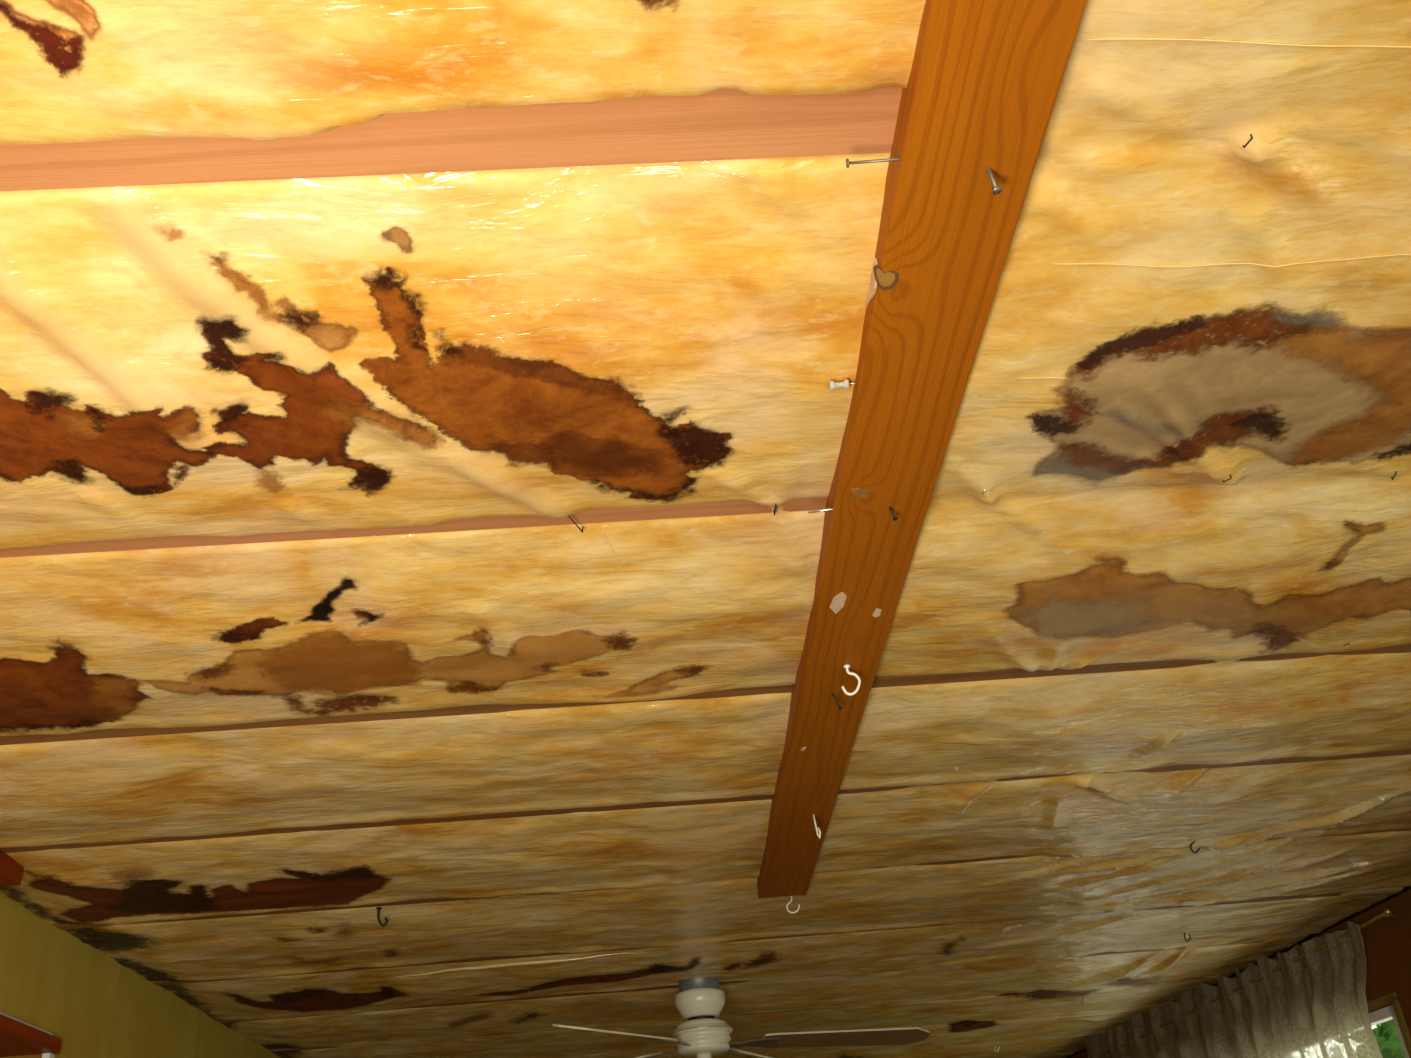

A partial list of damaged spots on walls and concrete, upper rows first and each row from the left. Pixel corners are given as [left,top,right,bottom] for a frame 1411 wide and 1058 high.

water stain [0,0,99,78]
water stain [638,0,675,9]
water stain [0,255,732,503]
water stain [1026,304,1411,481]
water stain [1321,521,1384,571]
water stain [1006,557,1411,651]
water stain [0,579,637,733]
water stain [611,666,706,696]
water stain [0,865,410,1031]